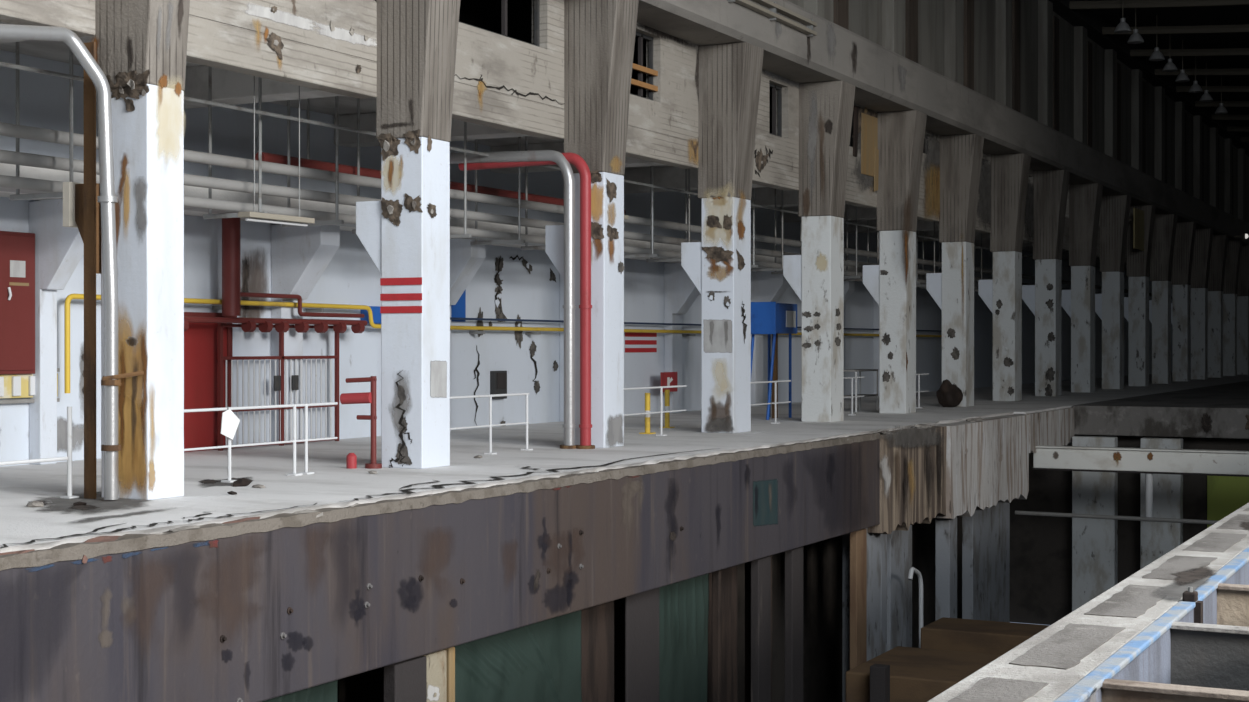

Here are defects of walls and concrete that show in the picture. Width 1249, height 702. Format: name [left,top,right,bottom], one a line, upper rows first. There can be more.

crack [456,74,559,104]
corrosion [388,157,403,184]
spalling [381,193,437,226]
corrosion [590,156,625,274]
corrosion [118,319,155,490]
damp [529,519,578,611]
damp [399,578,421,610]
damp [283,633,312,669]